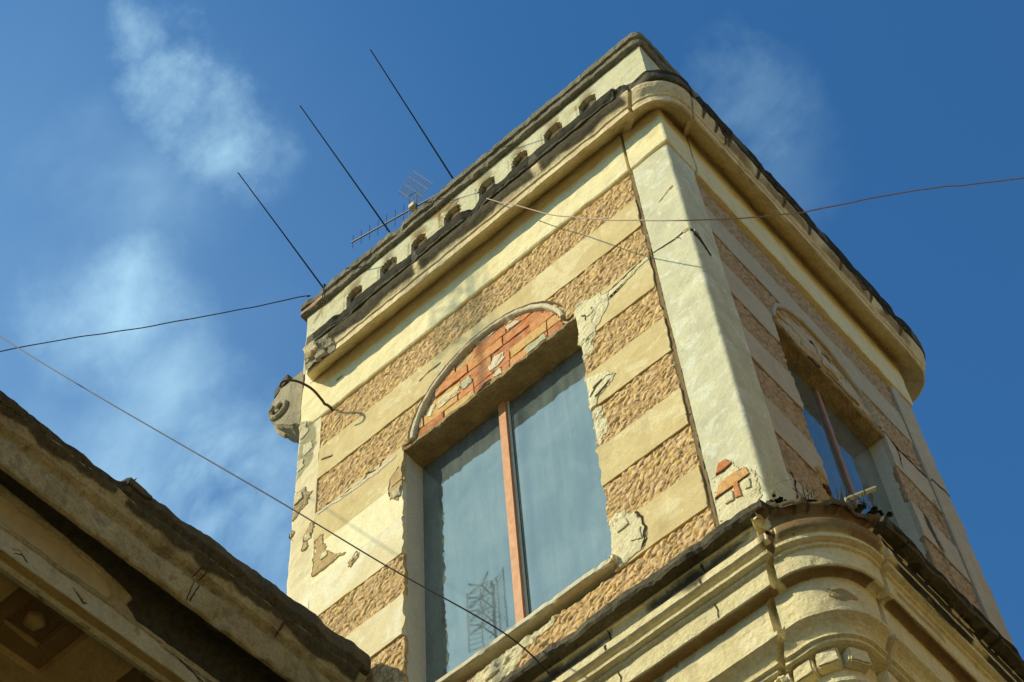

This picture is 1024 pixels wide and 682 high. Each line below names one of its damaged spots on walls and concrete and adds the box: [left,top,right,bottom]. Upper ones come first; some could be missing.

water stain [312,69,689,339]
water stain [0,390,118,493]
water stain [0,469,288,682]
water stain [126,492,363,681]
peeling [289,421,360,577]
spalling [585,370,616,446]
peeling [614,517,642,541]
peeling [701,459,772,549]